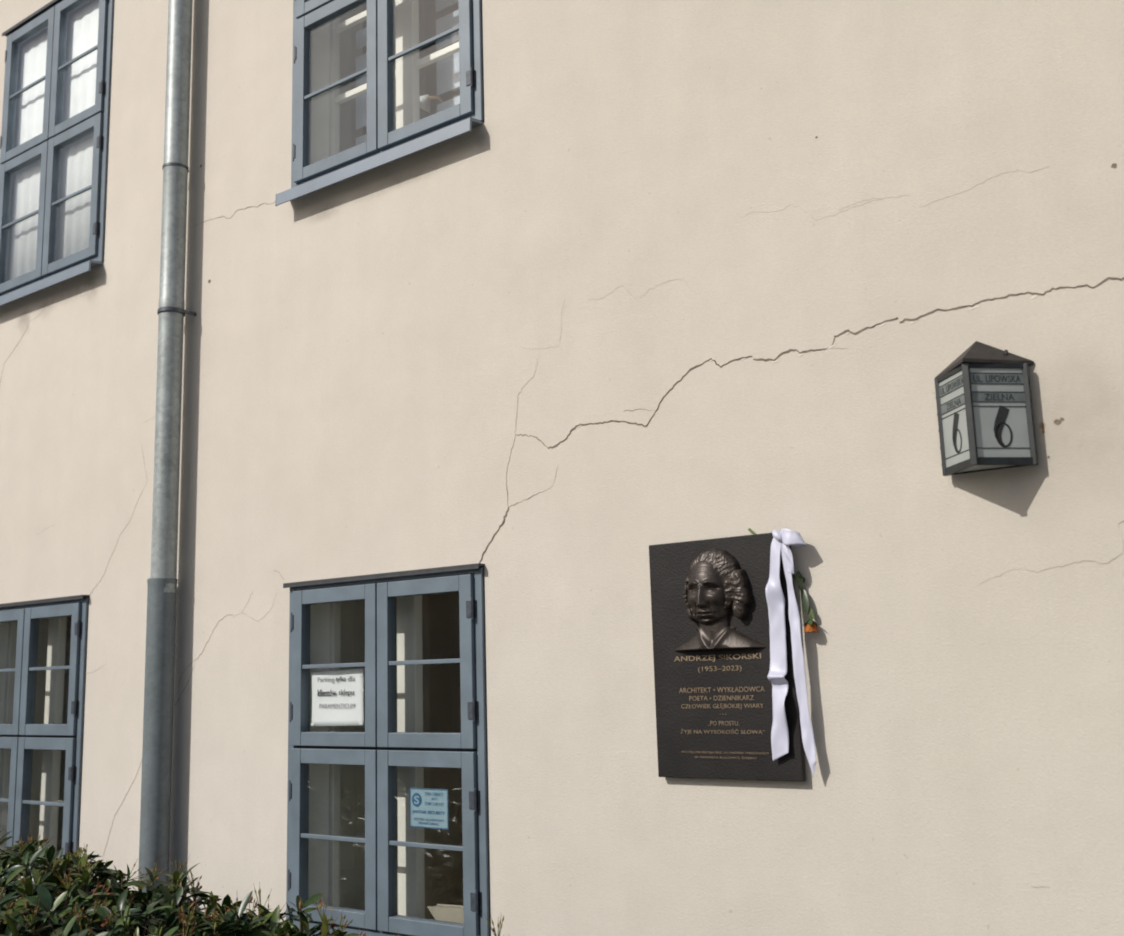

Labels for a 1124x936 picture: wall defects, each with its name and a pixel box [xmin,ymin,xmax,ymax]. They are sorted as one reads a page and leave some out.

crack [479,277,1124,563]
crack [980,521,1124,584]